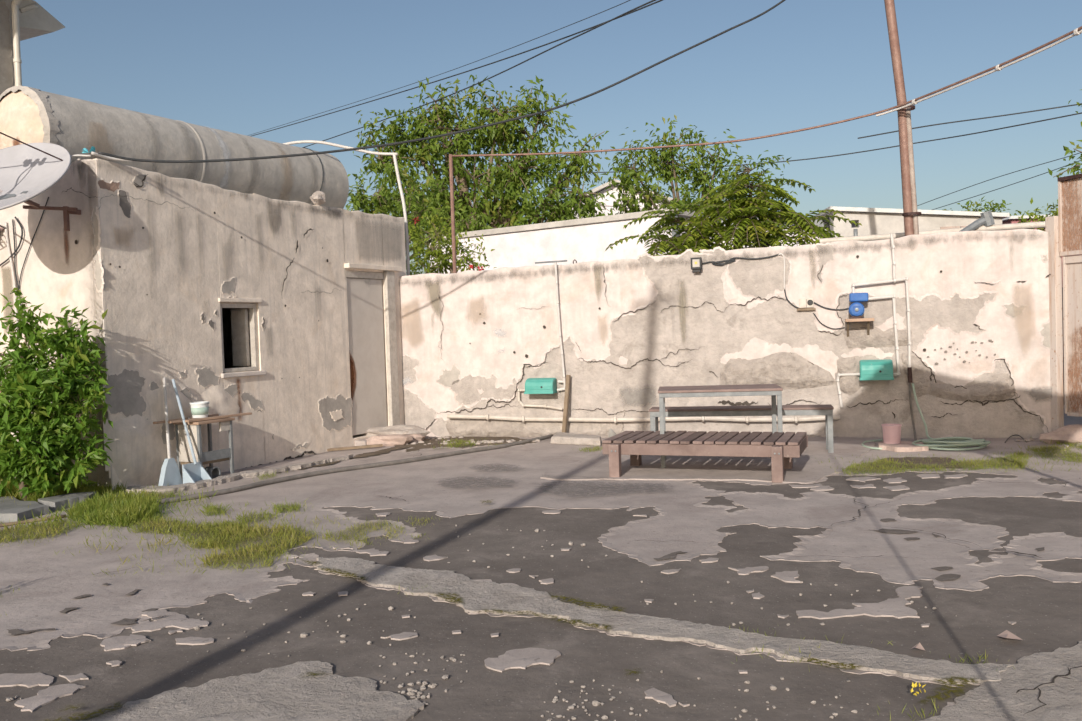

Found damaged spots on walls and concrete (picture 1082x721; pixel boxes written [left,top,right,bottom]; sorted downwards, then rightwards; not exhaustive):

peeling [0,0,14,95]
corrosion [1062,180,1082,251]
peeling [103,368,160,418]
peeling [160,423,176,446]
peeling [317,394,353,432]
peeling [402,242,1048,438]
corrosion [1068,329,1082,412]
crack [1016,665,1082,713]